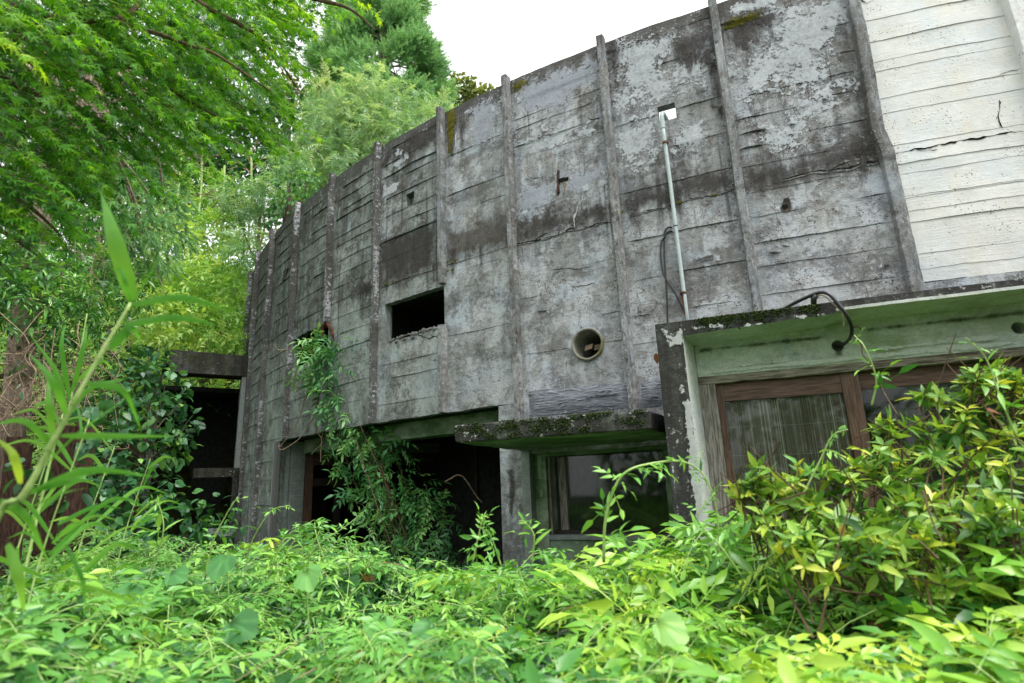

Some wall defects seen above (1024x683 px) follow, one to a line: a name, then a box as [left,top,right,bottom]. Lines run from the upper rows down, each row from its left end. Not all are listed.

leakage [726,9,776,49]
leakage [674,37,721,110]
crack [774,69,1024,183]
leakage [524,196,610,236]
crack [517,189,733,245]
peeling [664,324,723,347]
peeling [679,384,709,552]